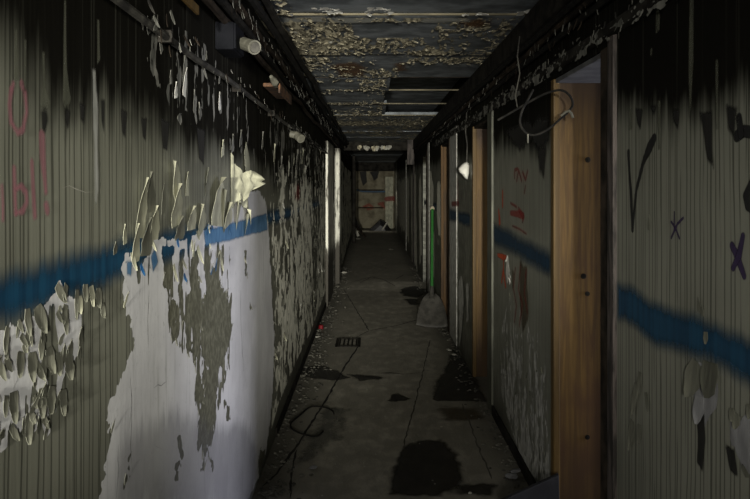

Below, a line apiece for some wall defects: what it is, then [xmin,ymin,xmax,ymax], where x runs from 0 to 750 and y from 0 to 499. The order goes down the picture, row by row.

peeling [256,0,530,151]
damp [700,60,718,163]
peeling [99,14,326,499]
peeling [0,280,106,453]
crack [263,275,420,498]
damp [389,440,497,496]
damp [433,346,487,420]
spalling [684,358,718,425]
spalling [729,404,750,478]